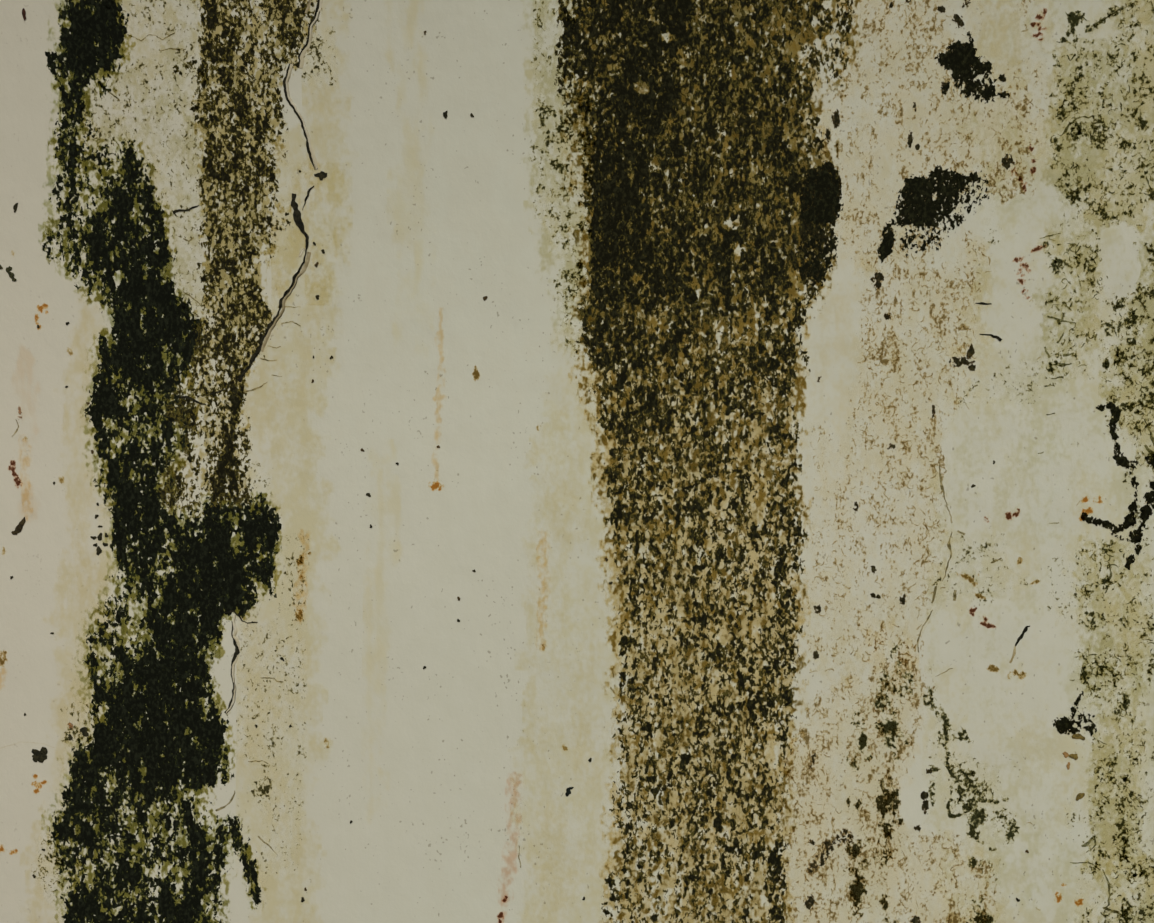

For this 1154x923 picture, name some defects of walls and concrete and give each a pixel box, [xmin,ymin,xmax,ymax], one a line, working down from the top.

damp [34,0,335,923]
crack [178,0,323,405]
damp [531,0,1154,923]